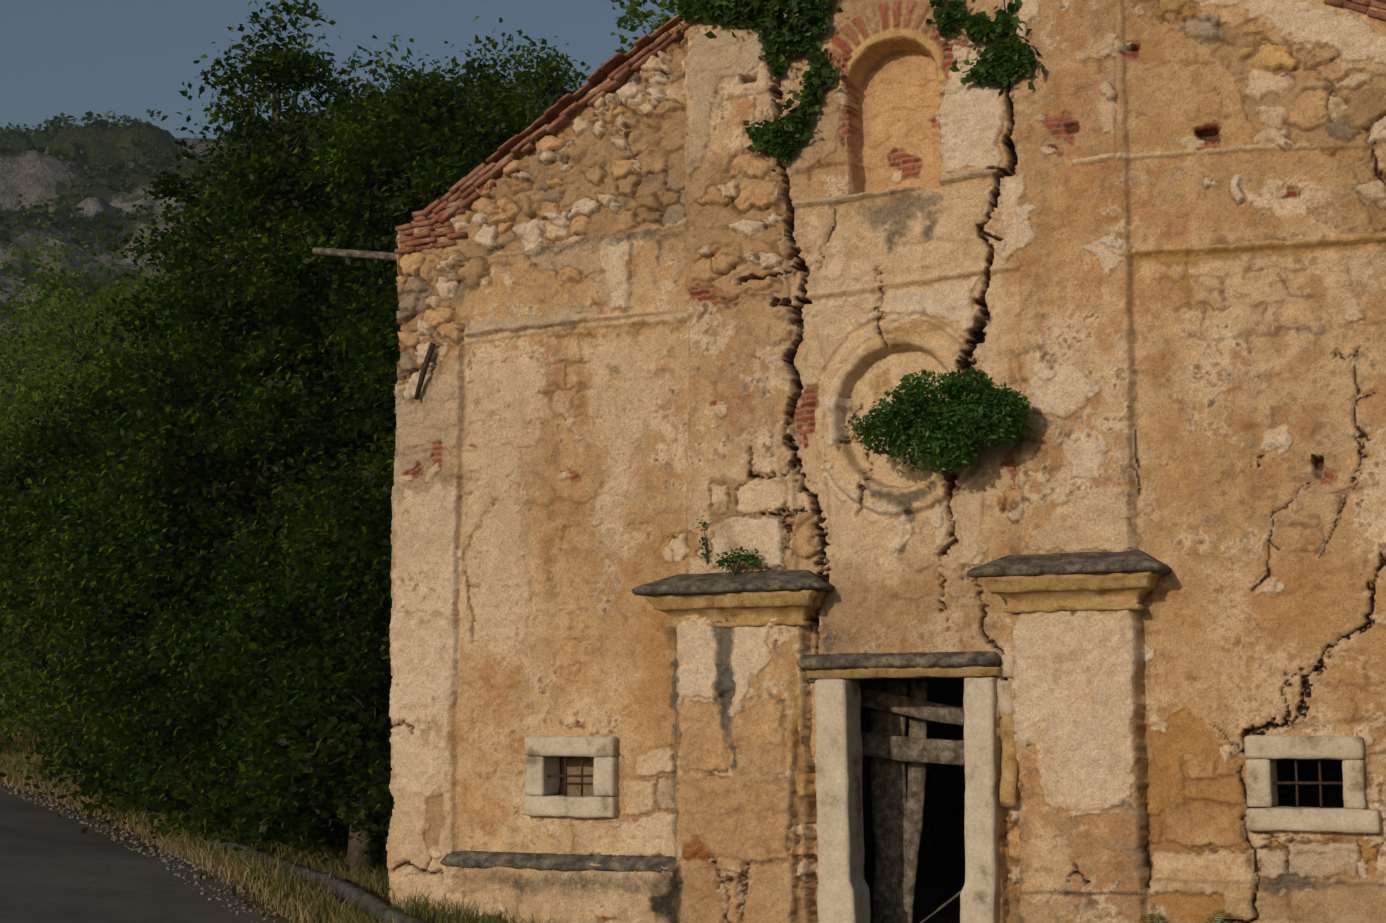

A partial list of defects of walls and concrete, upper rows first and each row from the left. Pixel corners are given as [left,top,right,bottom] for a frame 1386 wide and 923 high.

spalling [1034,109,1081,157]
flaking render [1074,32,1143,62]
flaking render [1097,81,1120,136]
spalling [1128,0,1386,321]
crack [957,88,1018,372]
flaking render [1081,231,1133,276]
spalling [389,0,1044,923]
crack [740,162,837,578]
crack [1333,351,1377,481]
crack [939,472,959,607]
crack [1251,499,1295,590]
crack [1222,551,1386,923]